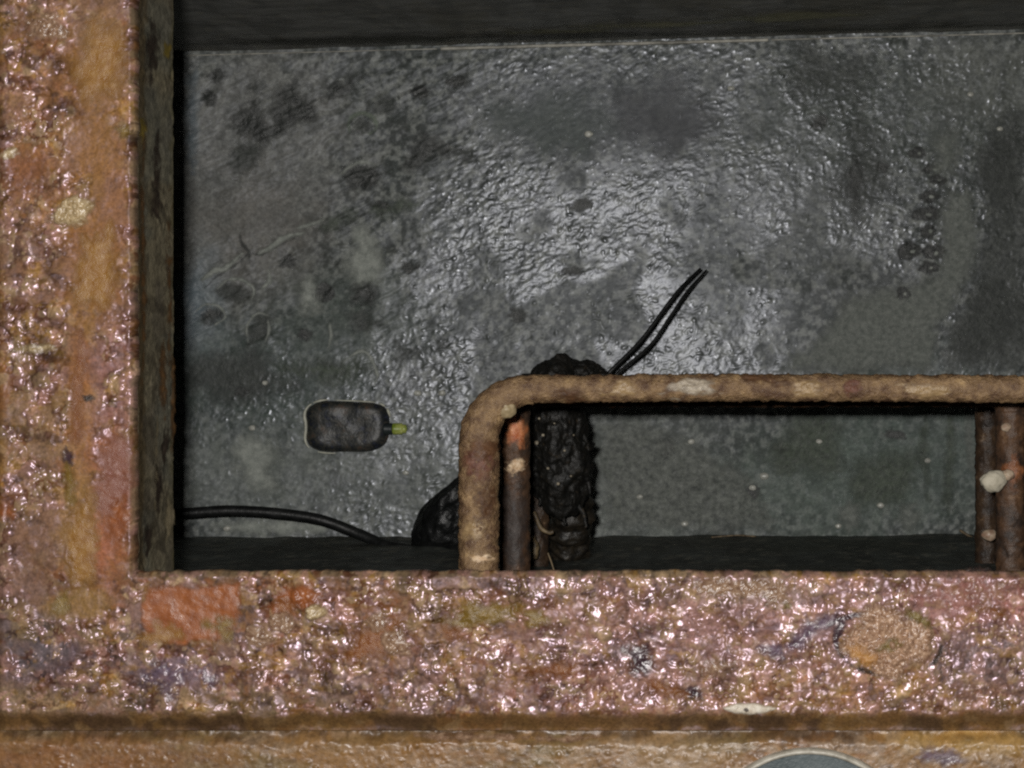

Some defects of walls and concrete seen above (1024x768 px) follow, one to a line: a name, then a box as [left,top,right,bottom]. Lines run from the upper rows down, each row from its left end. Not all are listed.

water stain [230,84,315,171]
water stain [343,160,378,189]
water stain [184,277,255,337]
water stain [301,277,319,312]
water stain [328,214,382,329]
water stain [785,115,1024,371]
corrosion [742,374,789,387]
water stain [236,436,276,491]
corrosion [505,415,528,474]
corrosion [1001,456,1024,482]
water stain [221,519,325,535]
corrosion [137,583,241,645]